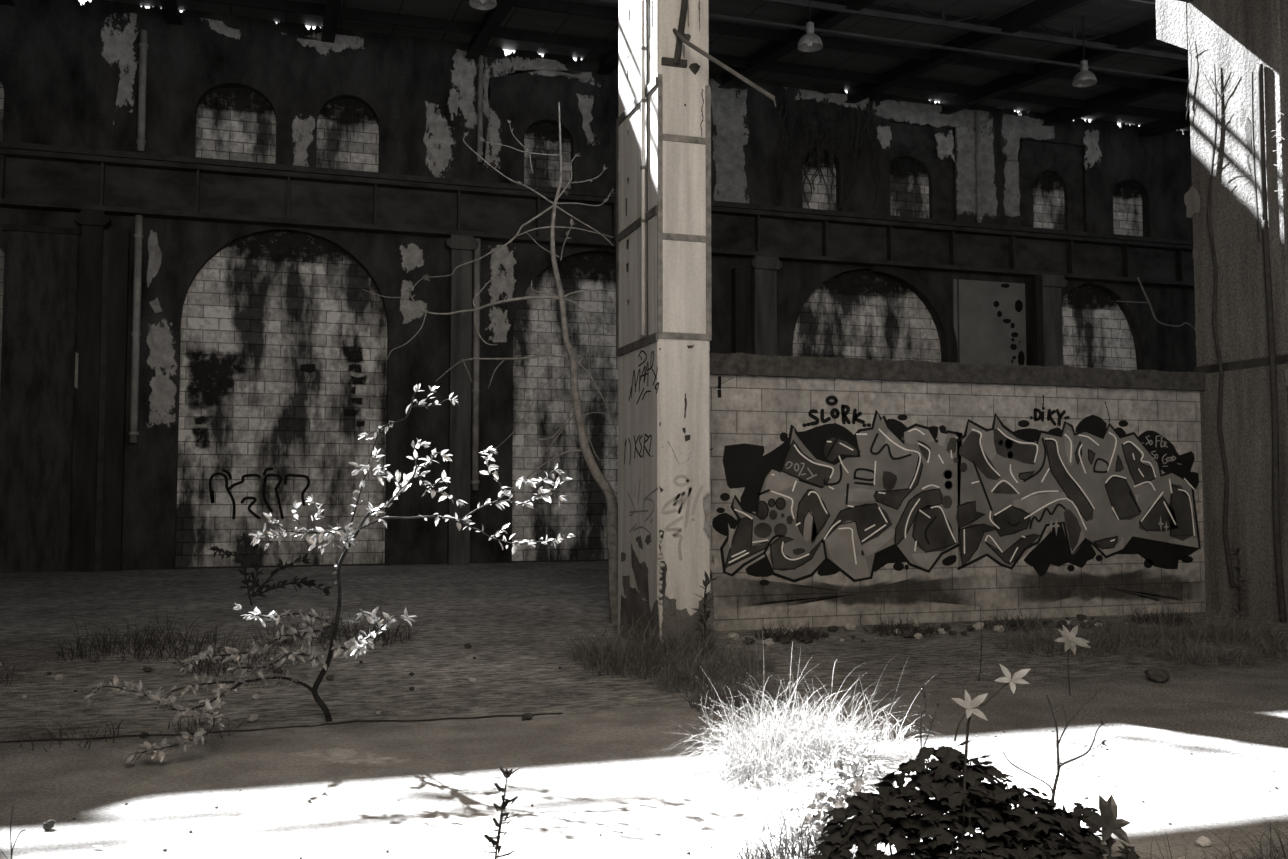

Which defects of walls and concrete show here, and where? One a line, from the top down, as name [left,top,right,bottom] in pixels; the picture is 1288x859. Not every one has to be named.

flaking render [101,13,138,125]
flaking render [423,49,601,178]
flaking render [784,87,1055,217]
flaking render [1083,129,1102,170]
flaking render [400,243,427,324]
flaking render [485,244,517,343]